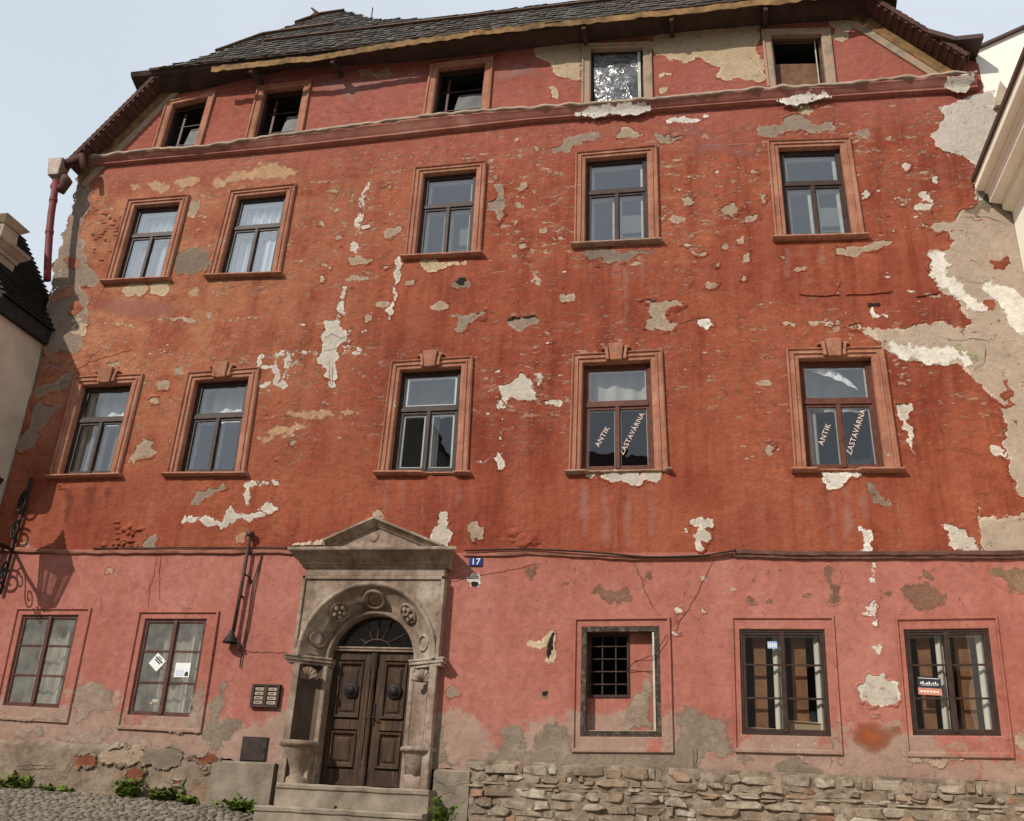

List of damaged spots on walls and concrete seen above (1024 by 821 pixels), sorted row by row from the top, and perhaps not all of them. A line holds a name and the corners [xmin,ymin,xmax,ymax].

spalling [574,26,766,145]
spalling [15,182,135,455]
spalling [256,182,471,448]
spalling [636,295,689,335]
spalling [777,73,1024,551]
spalling [476,360,563,472]
spalling [181,478,281,545]
spalling [685,516,716,554]
spalling [74,681,243,787]
spalling [527,629,557,666]
crack [634,563,712,631]
spalling [854,671,902,719]